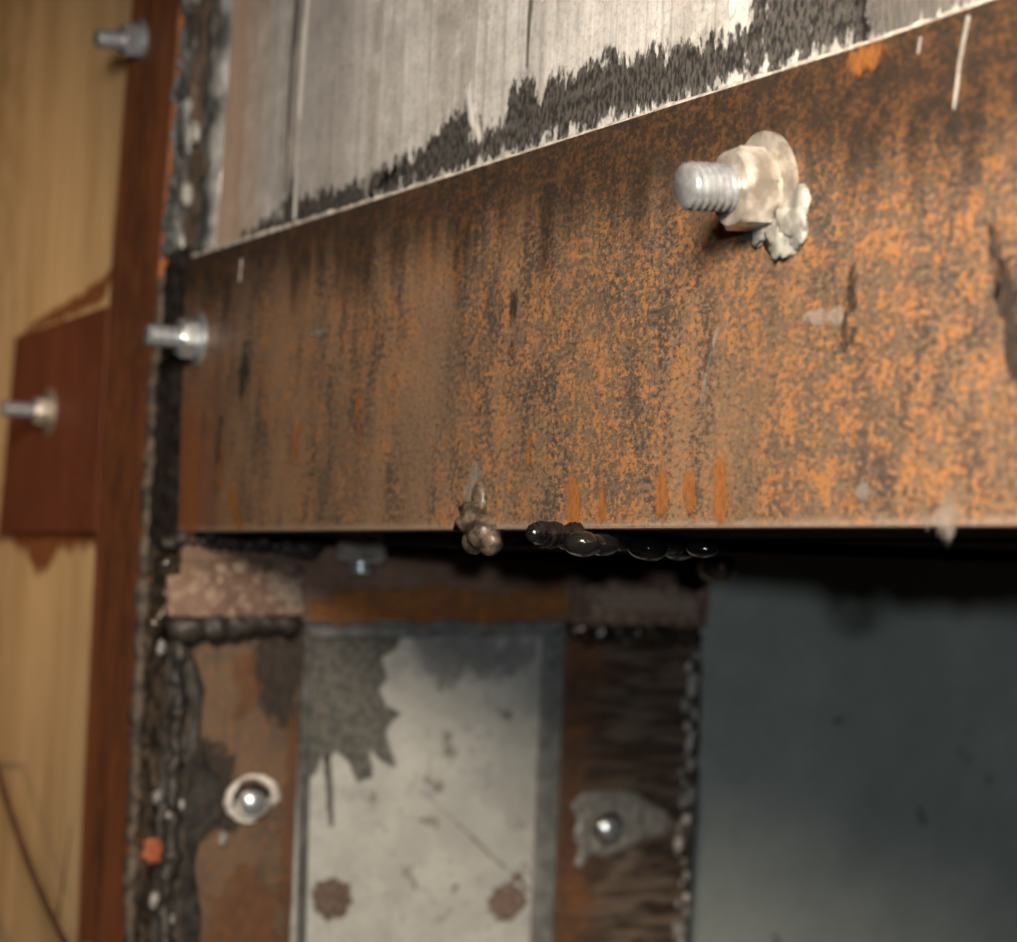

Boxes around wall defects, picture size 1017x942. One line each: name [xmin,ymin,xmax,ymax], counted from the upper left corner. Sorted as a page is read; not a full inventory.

corrosion [847,41,881,75]
water stain [509,289,517,319]
water stain [840,265,857,351]
water stain [987,224,1017,381]
corrosion [566,475,580,523]
corrosion [656,470,668,518]
corrosion [684,472,696,513]
corrosion [712,460,728,524]
corrosion [308,584,570,626]
peeling [310,637,401,826]
corrosion [311,878,352,922]
corrosion [487,872,528,922]